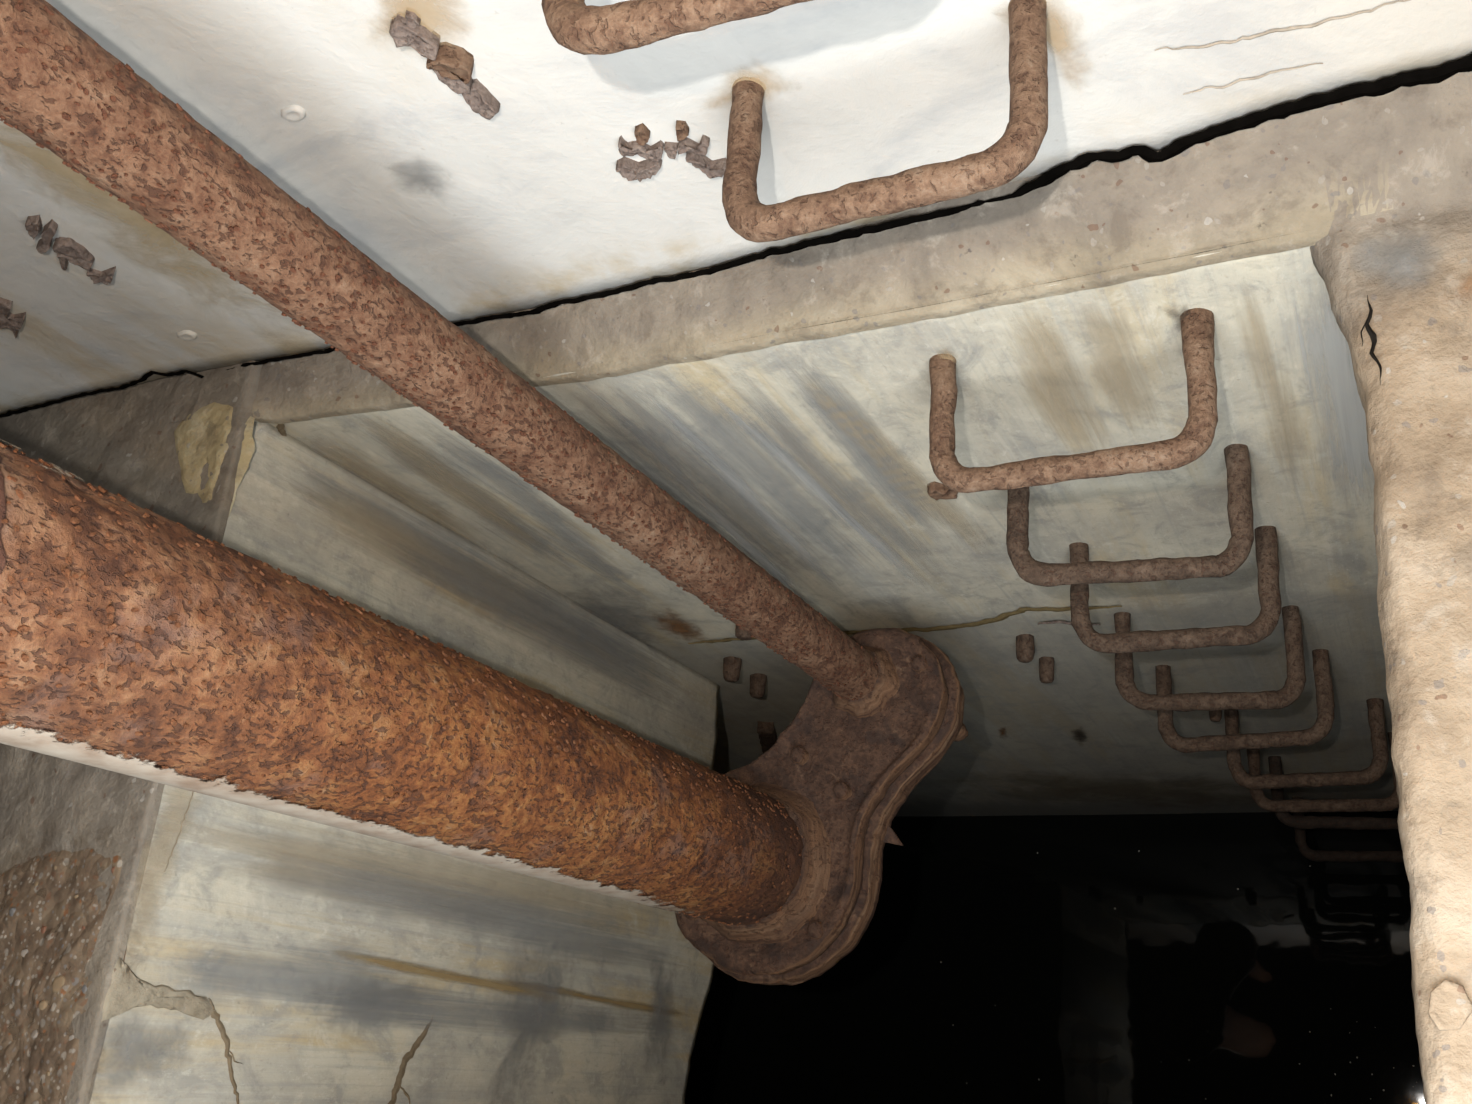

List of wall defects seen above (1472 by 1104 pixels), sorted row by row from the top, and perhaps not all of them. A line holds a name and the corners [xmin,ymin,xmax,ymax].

crack [453,54,1472,326]
crack [0,347,335,418]
corrosion [0,0,878,701]
crack [1360,295,1382,385]
water stain [625,414,813,590]
spalling [0,848,217,1104]
crack [208,998,242,1104]
crack [388,1017,433,1104]